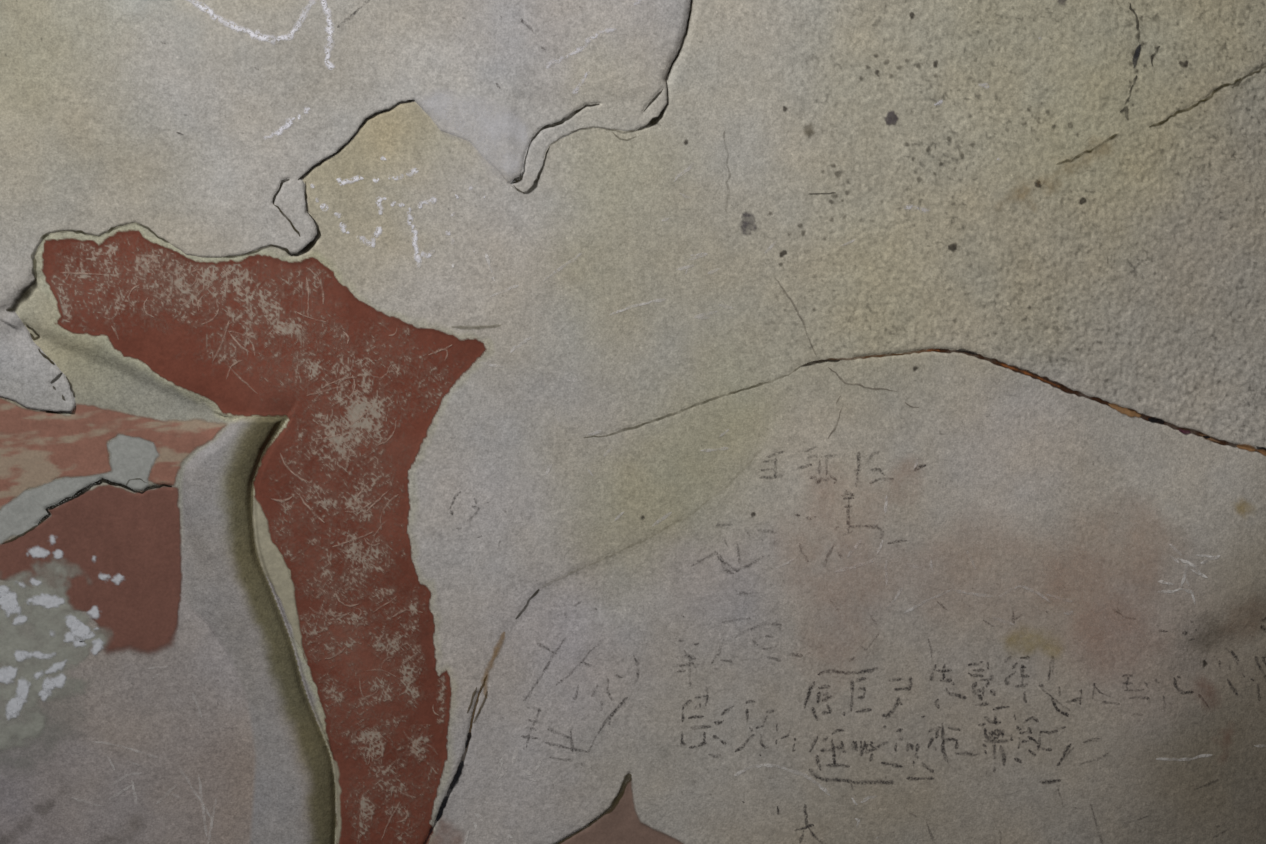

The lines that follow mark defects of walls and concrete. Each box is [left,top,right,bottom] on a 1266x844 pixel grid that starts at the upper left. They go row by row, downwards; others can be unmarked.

crack [1063,3,1263,163]
flaking render [0,0,691,844]
crack [801,349,1266,456]
crack [424,589,539,844]